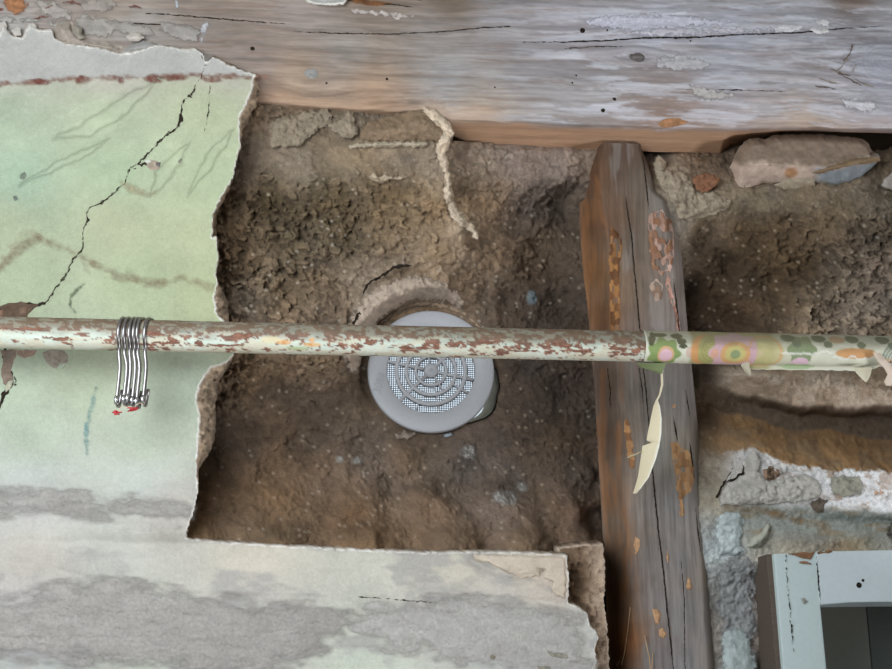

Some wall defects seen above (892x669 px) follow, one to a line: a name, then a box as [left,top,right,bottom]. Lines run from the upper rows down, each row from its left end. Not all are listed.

flaking render [0,20,157,52]
crack [27,64,211,307]
spalling [216,103,597,330]
crack [0,348,17,407]
spalling [0,349,610,669]